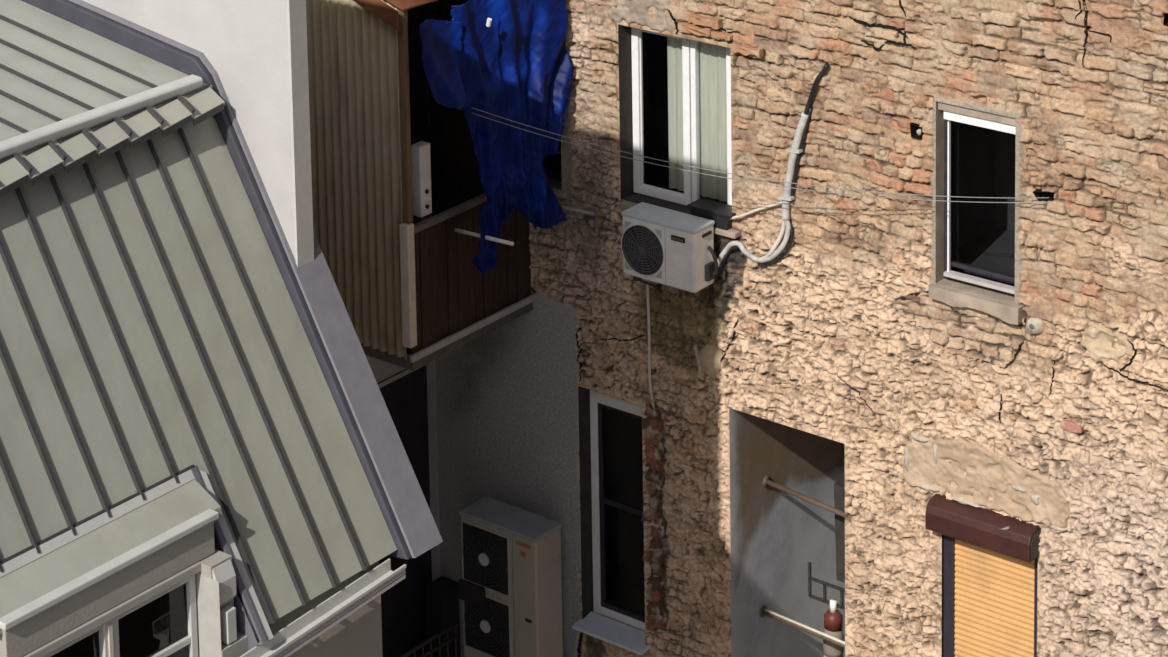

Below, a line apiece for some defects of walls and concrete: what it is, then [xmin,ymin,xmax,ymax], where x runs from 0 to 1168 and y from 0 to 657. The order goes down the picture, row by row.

crack [1075,0,1112,68]
damp [640,227,746,370]
crack [1103,339,1168,391]
spalling [641,403,668,630]